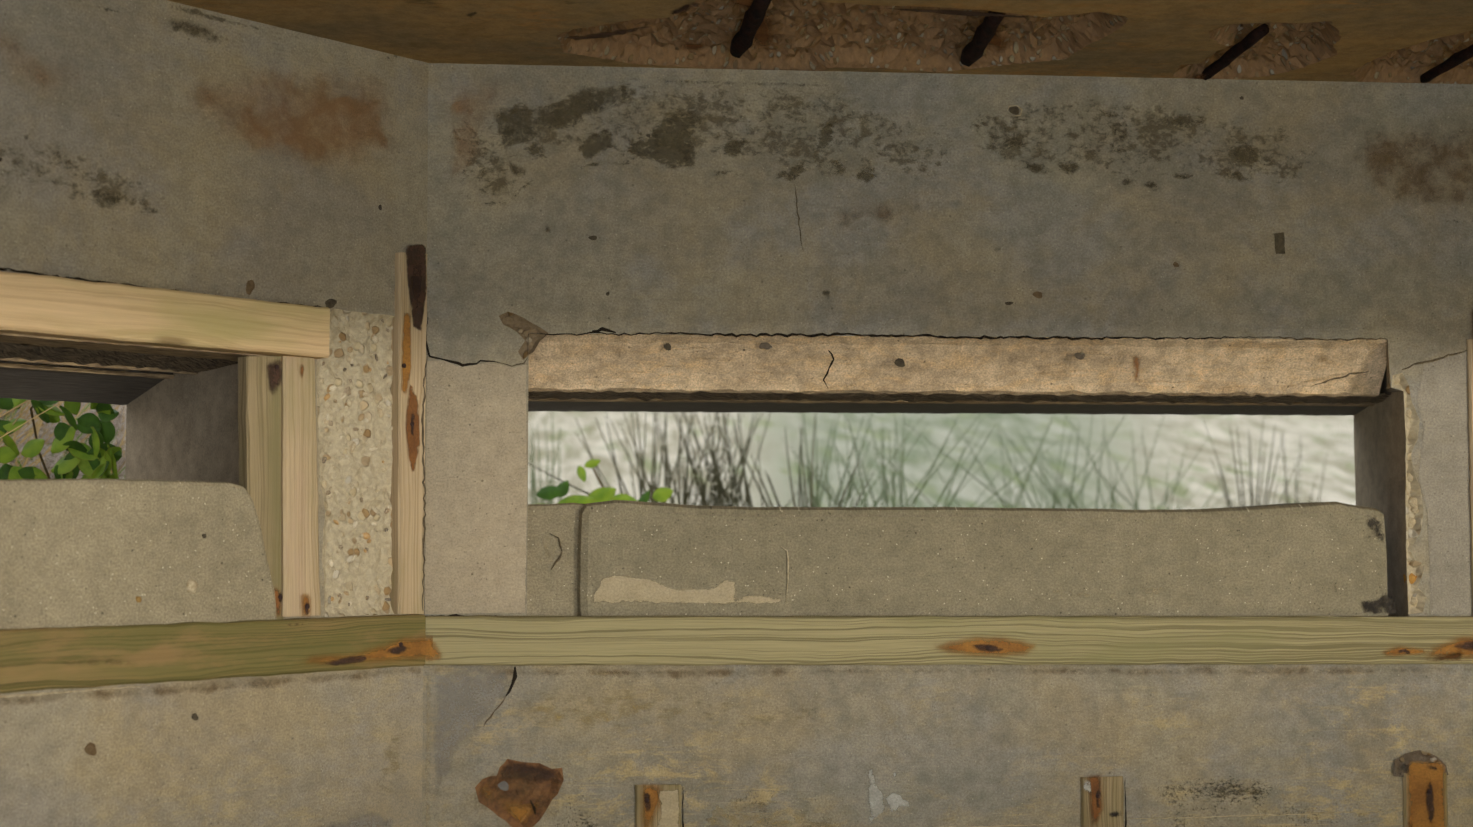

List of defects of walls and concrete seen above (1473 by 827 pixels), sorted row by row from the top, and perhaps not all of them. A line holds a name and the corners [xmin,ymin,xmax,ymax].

spalling [1173,21,1341,81]
spalling [1349,30,1473,84]
spalling [457,0,1128,204]
crack [421,319,1467,610]
crack [484,667,517,726]
water stain [1166,776,1271,827]